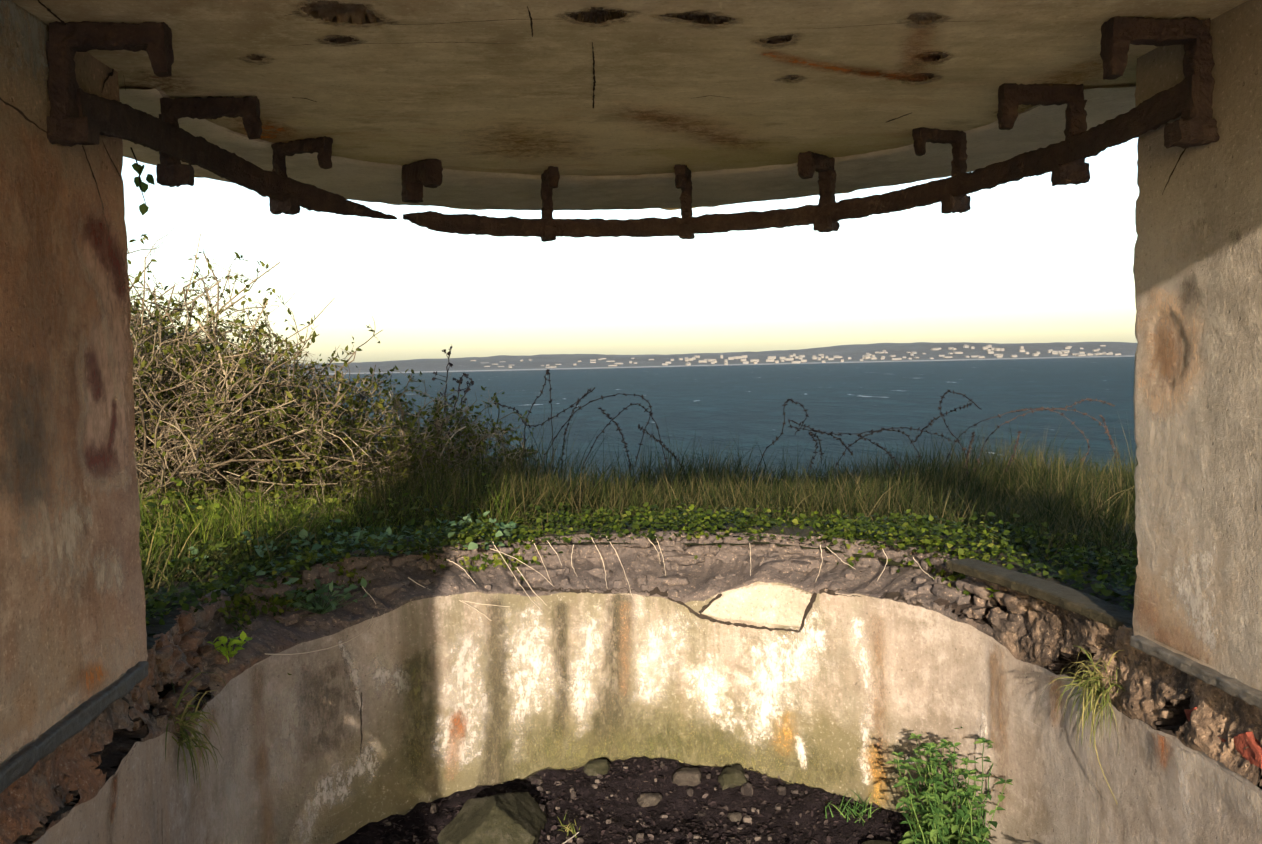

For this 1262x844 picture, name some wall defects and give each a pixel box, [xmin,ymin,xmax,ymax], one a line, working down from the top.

spalling [294,0,392,46]
spalling [660,10,736,27]
crack [590,42,598,108]
crack [0,98,48,133]
crack [516,587,924,633]
spalling [934,593,1007,627]
spalling [1045,644,1097,680]
spalling [88,682,178,783]
water stain [432,595,826,786]
water stain [851,617,884,793]
spalling [1155,696,1192,733]
spalling [11,789,79,844]